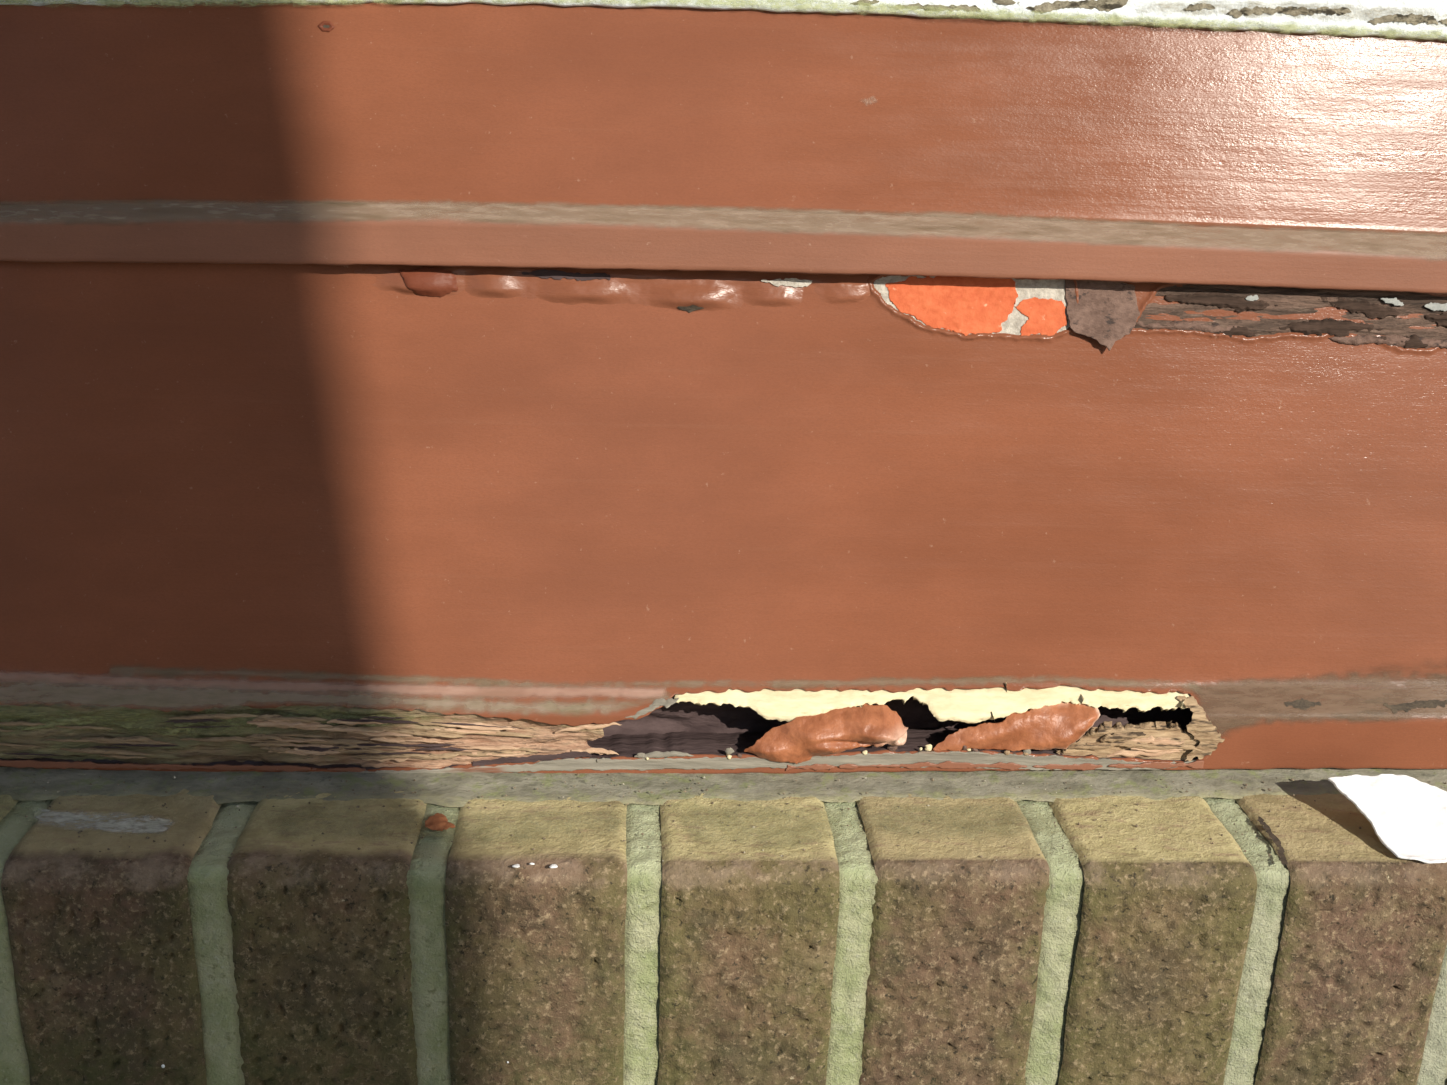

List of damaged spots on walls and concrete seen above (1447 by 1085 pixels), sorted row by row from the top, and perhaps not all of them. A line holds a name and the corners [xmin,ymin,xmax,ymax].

spalling [867,274,1140,351]
peeling [1380,297,1404,306]
peeling [1424,302,1447,311]
peeling [744,703,908,764]
peeling [933,702,1100,751]